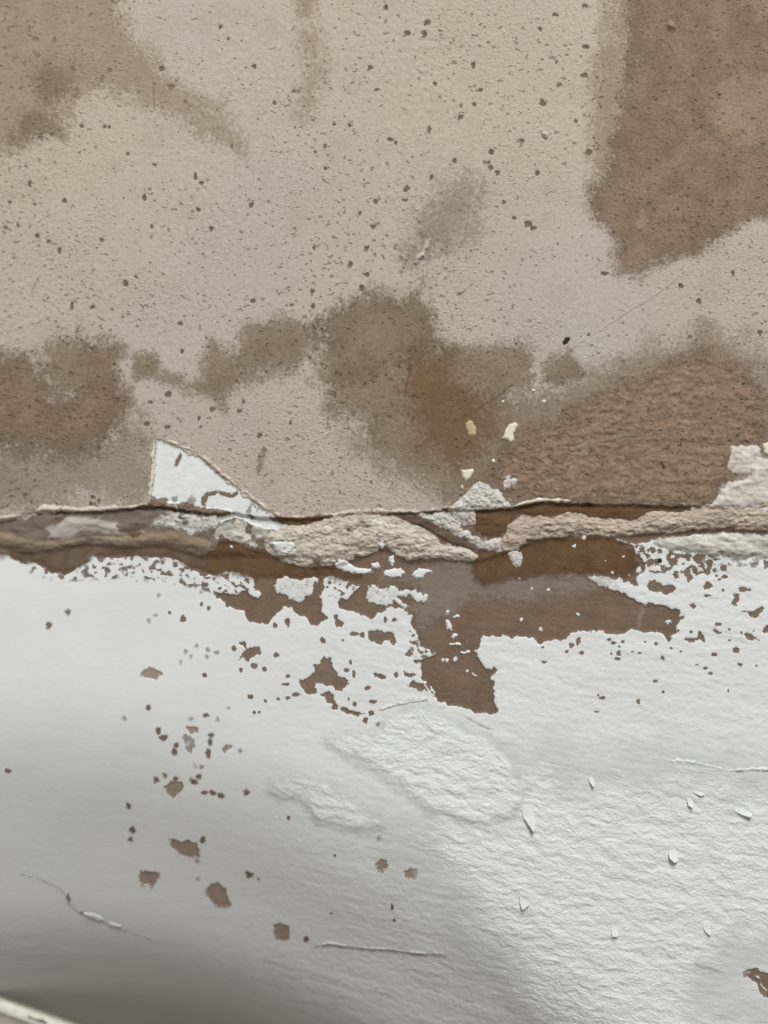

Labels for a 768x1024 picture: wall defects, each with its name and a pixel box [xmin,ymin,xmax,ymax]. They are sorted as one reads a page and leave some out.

water stain [592,0,768,274]
water stain [0,290,768,537]
crack [576,503,768,537]
flaking render [0,347,768,727]
peeling [154,713,242,798]
peeling [171,836,205,863]
peeling [139,871,159,887]
peeling [197,878,231,908]
peeling [403,868,417,880]
peeling [273,923,290,941]
peeling [743,968,768,998]